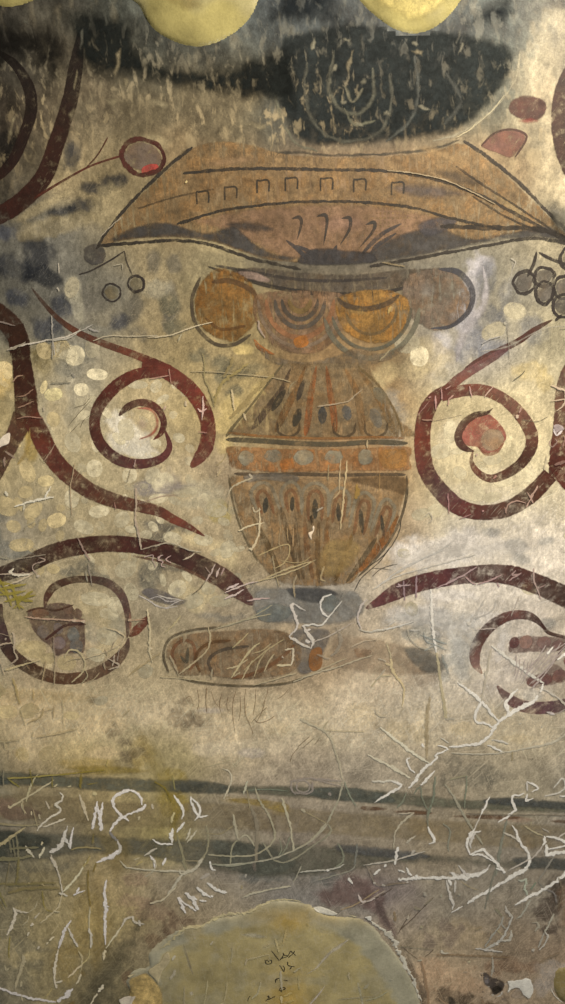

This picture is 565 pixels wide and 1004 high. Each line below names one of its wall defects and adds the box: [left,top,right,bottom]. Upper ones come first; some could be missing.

crack [398,897,434,959]
flaking render [119,952,170,1004]
flaking render [481,971,534,1001]